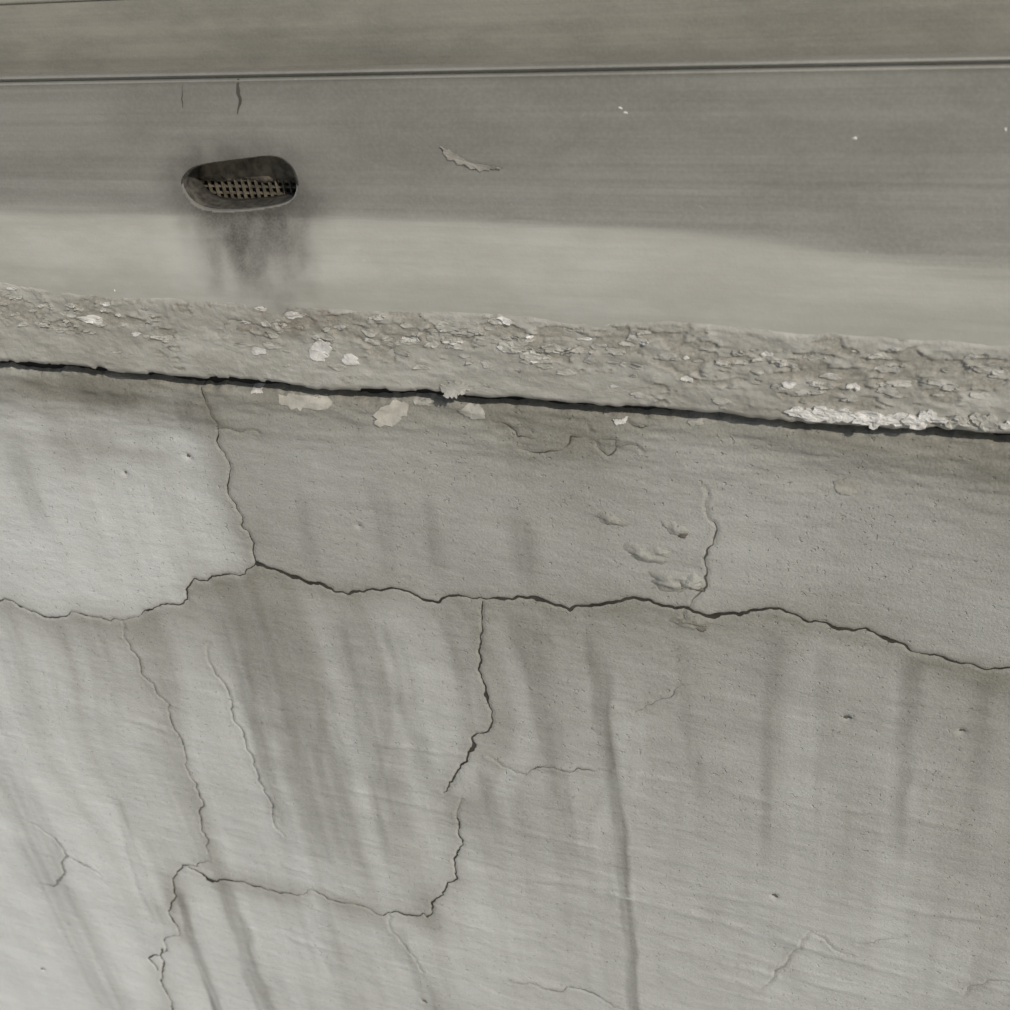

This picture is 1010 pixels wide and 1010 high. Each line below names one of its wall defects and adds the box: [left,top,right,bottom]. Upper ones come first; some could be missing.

crack [0,360,107,371]
peeling [0,287,173,343]
peeling [251,383,265,394]
peeling [234,306,360,371]
peeling [440,380,491,399]
peeling [361,314,652,377]
peeling [712,348,1010,432]
peeling [688,411,704,426]
crack [0,372,1010,1010]